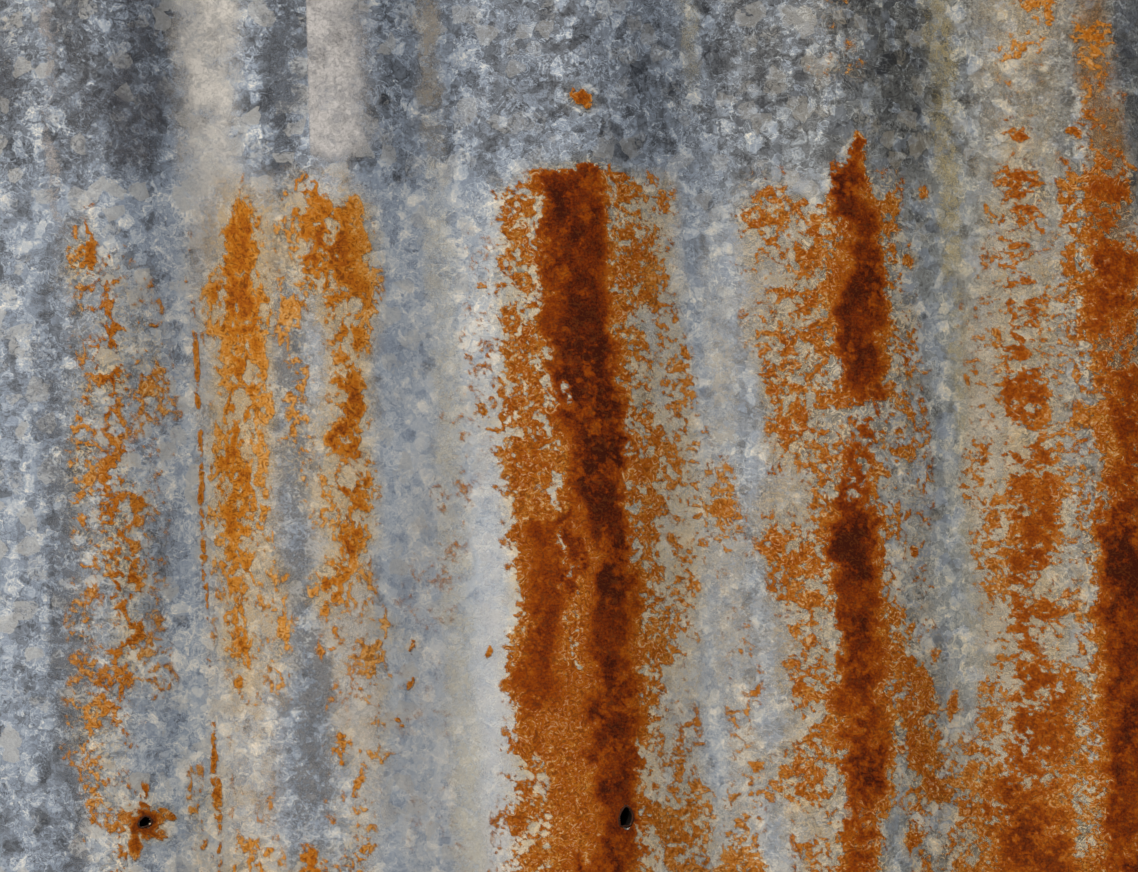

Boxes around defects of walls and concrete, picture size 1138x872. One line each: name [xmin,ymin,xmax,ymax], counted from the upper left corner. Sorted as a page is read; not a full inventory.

corrosion [992,0,1057,86]
corrosion [60,171,404,872]
corrosion [440,15,1138,872]